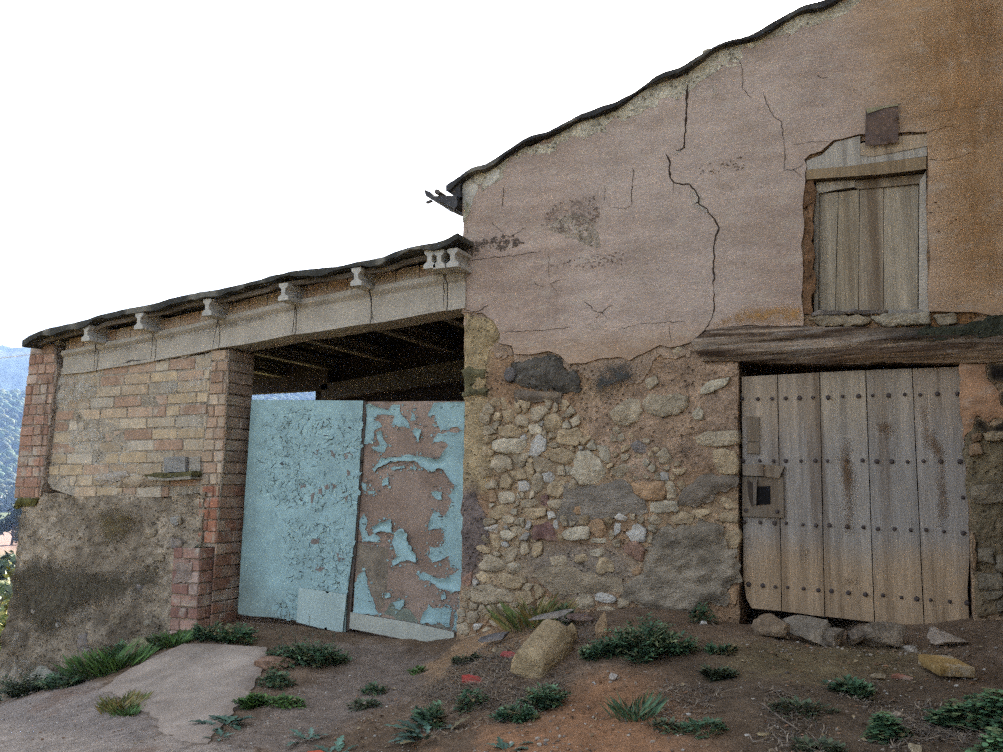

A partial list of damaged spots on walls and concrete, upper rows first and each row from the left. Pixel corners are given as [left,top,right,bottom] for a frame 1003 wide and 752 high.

crack [499,327,568,351]
crack [585,73,720,339]
crack [739,61,829,171]
flaking render [257,332,743,638]